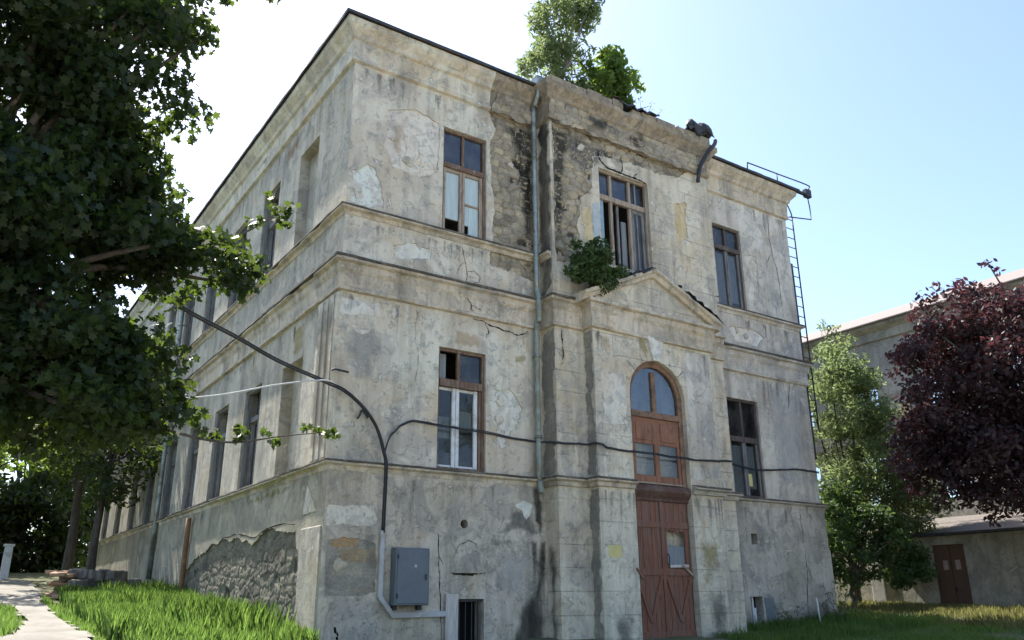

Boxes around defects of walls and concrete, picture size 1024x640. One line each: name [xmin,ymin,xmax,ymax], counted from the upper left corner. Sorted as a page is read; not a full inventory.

peeling [351,165,384,208]
flaking render [489,92,534,281]
flaking render [549,98,704,262]
crack [457,247,526,338]
water stain [584,332,596,475]
flaking render [184,528,298,623]
flaking render [303,485,377,596]
peeling [515,500,532,519]
water stain [512,490,556,640]
water stain [590,489,603,629]